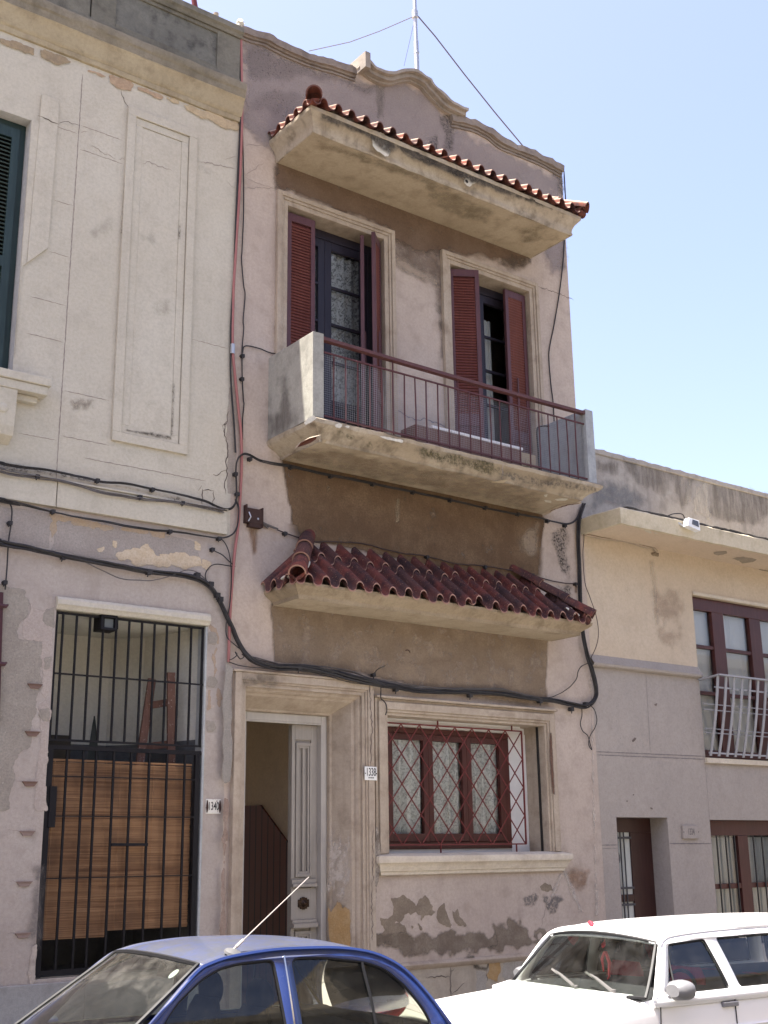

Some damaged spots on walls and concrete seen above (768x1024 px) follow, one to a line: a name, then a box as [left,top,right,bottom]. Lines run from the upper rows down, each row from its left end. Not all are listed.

spalling [0,38,70,65]
spalling [88,70,239,130]
water stain [322,109,552,209]
crack [198,411,229,502]
peeling [50,513,211,570]
mould [553,529,569,572]
peeling [22,604,53,811]
peeling [327,842,351,946]